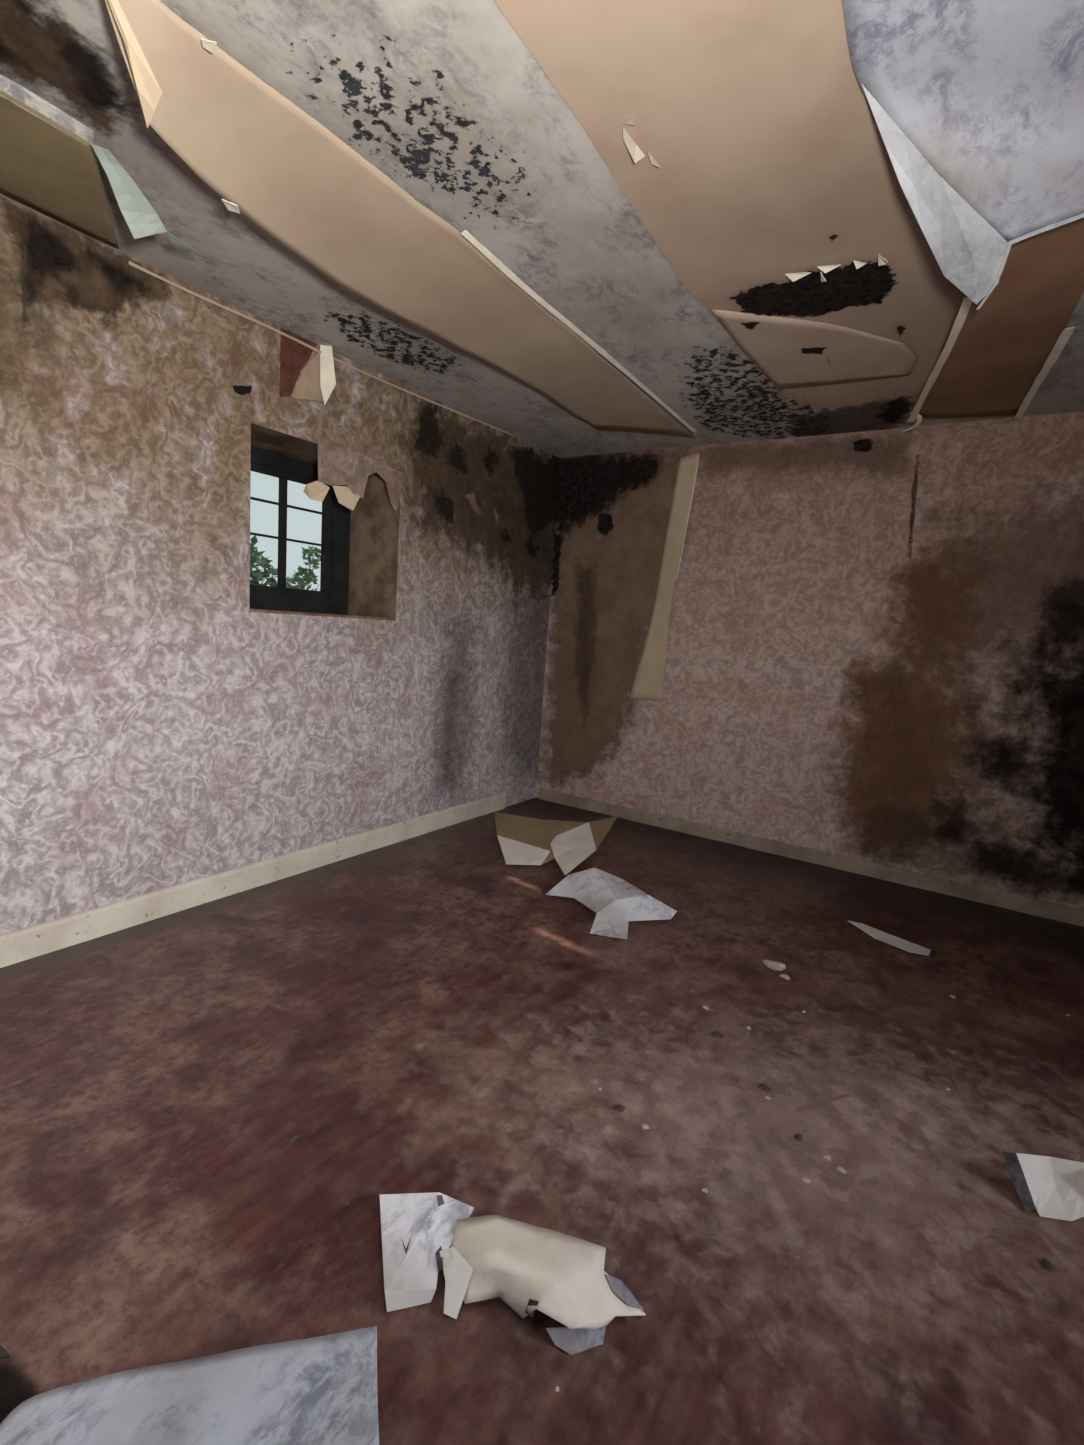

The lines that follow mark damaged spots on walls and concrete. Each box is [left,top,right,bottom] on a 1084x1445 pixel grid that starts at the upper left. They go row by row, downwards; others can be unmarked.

leakage [0,0,172,326]
spalling [233,386,252,395]
peeling [279,327,336,405]
leakage [324,309,462,375]
leakage [286,35,551,229]
leakage [397,401,658,599]
peeling [494,0,965,422]
leakage [678,346,915,472]
leakage [729,254,899,329]
peeling [540,446,693,785]
leakage [939,507,1084,894]